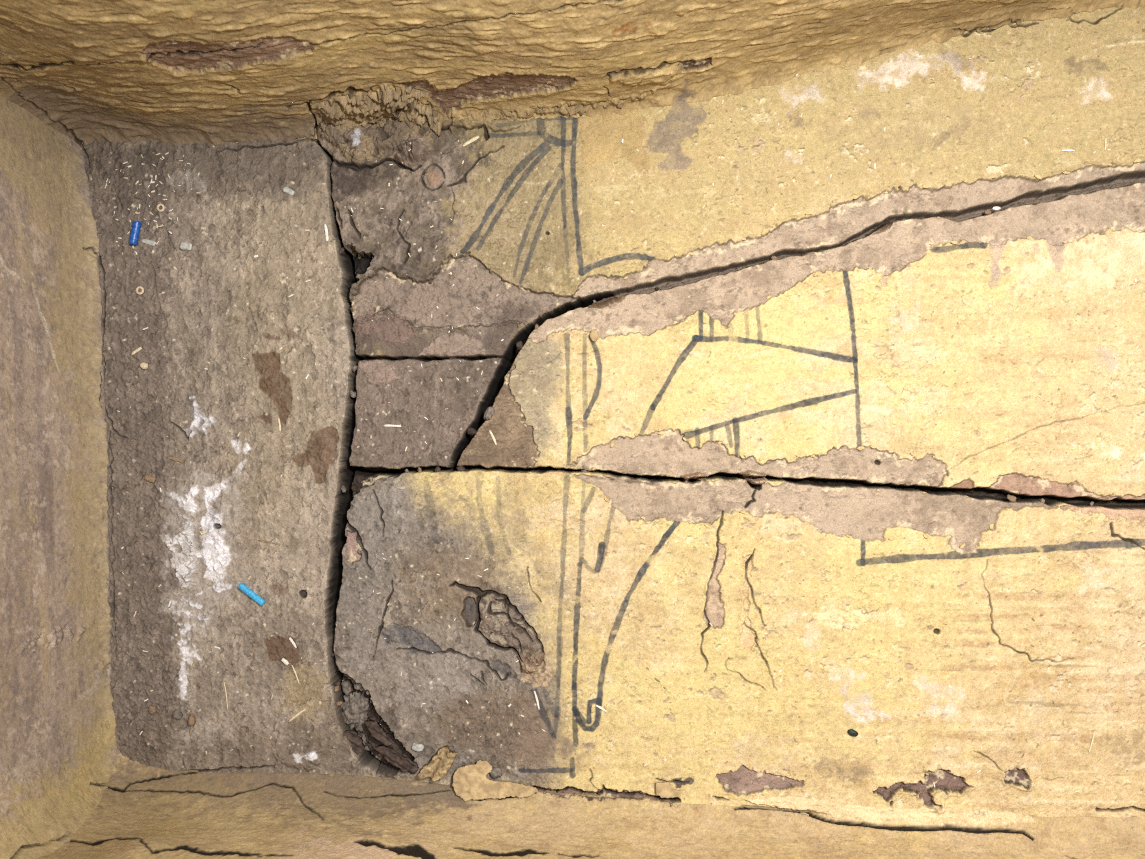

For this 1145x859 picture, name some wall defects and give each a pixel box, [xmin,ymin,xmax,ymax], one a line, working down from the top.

peeling [405,72,576,113]
peeling [350,158,1145,356]
damp [183,395,217,440]
peeling [358,359,401,384]
peeling [457,365,540,468]
crack [83,170,1145,842]
peeling [566,428,1145,554]
damp [155,438,258,701]
spalling [342,673,415,769]
peeling [716,765,1036,829]
crack [9,832,295,859]
crack [354,837,601,859]